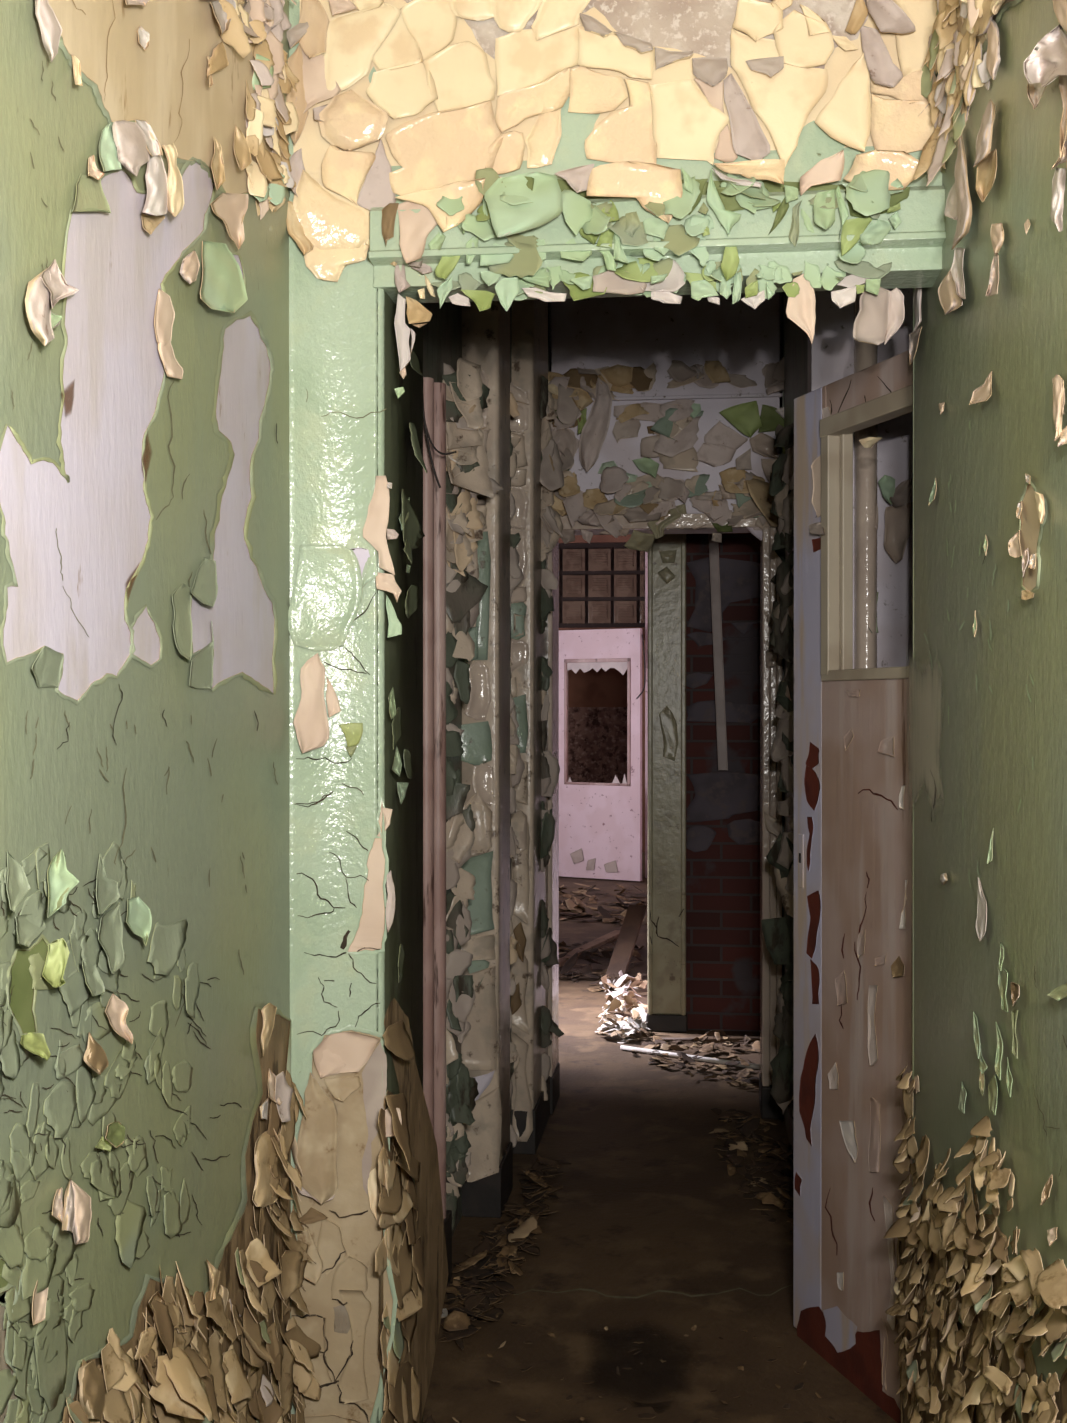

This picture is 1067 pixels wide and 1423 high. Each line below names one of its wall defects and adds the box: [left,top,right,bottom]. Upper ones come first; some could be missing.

peeling [1024,0,1067,232]
peeling [0,0,1021,704]
peeling [1052,375,1067,447]
crack [323,593,376,675]
peeling [1008,473,1048,600]
crack [1,685,224,940]
crack [209,852,247,893]
crack [273,757,364,807]
crack [296,831,380,1036]
peeling [0,357,847,1423]
peeling [797,942,1067,1423]
crack [292,1210,369,1423]